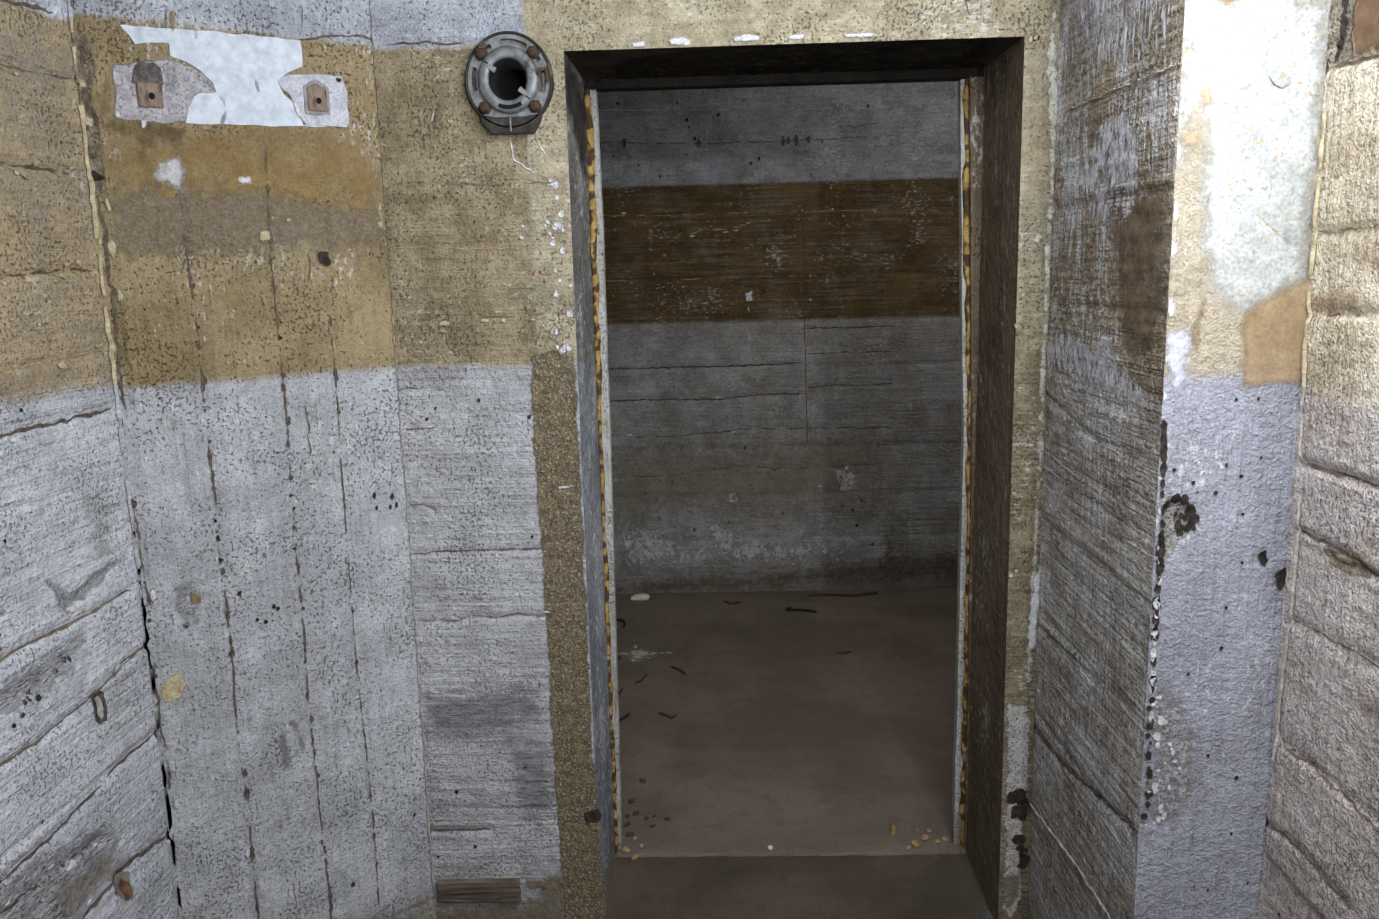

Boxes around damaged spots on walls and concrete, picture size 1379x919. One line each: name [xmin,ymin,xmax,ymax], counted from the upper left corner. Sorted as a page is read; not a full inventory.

crack [1,161,70,180]
peeling [71,11,349,197]
peeling [1177,0,1356,309]
crack [1327,55,1379,73]
crack [0,196,126,442]
peeling [1009,10,1147,683]
peeling [1163,299,1205,400]
crack [0,498,180,919]
spalling [1141,420,1218,825]
spalling [1323,547,1372,578]